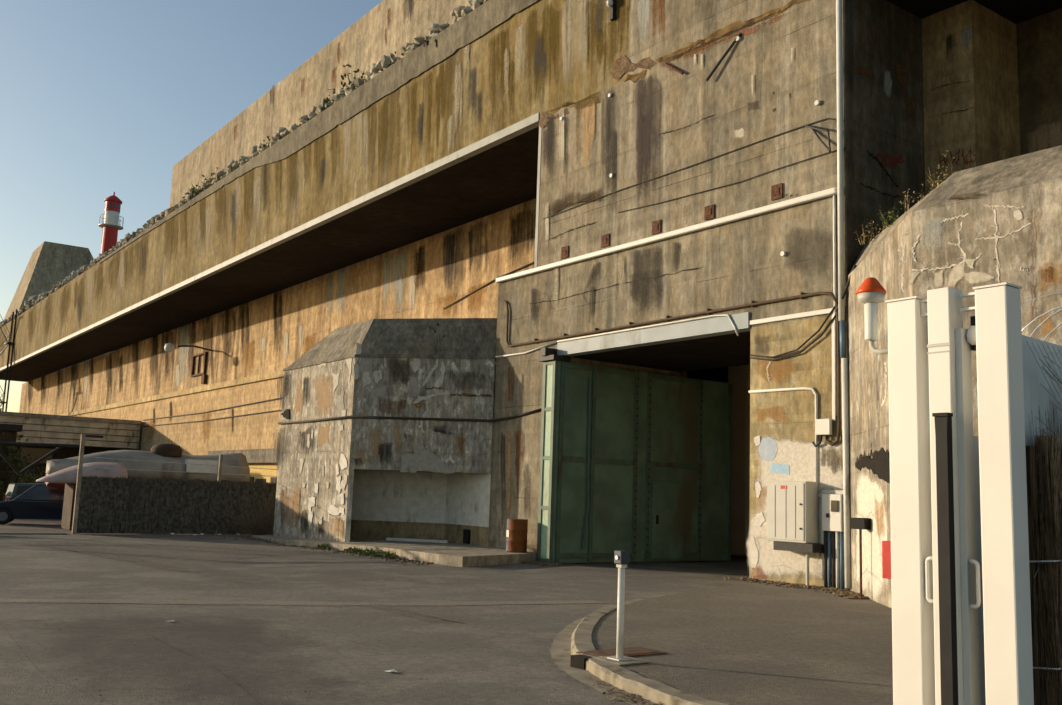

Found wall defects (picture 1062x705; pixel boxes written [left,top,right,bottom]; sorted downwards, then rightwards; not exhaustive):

water stain [368,63,480,162]
water stain [547,110,566,169]
water stain [579,92,615,190]
water stain [383,247,425,309]
water stain [510,191,594,255]
crack [898,203,1031,293]
water stain [28,302,249,401]
peeling [281,380,303,419]
peeling [299,343,390,526]
peeling [394,358,466,474]
peeling [750,512,765,578]
peeling [855,443,890,599]